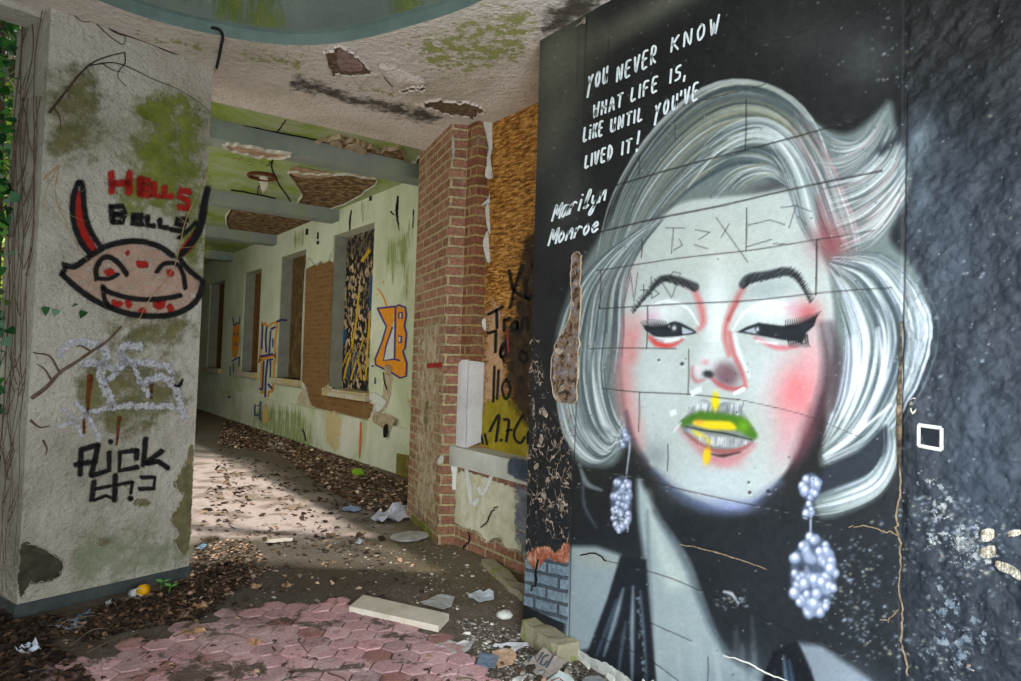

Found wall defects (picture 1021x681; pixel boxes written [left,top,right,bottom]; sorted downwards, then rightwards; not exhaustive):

flaking render [323,44,379,88]
flaking render [399,85,493,179]
spalling [222,142,378,209]
peeling [482,193,491,263]
flaking render [459,251,582,624]
flaking render [169,445,194,556]
flaking render [17,542,65,599]
crack [849,463,909,676]
peeling [979,528,1021,580]